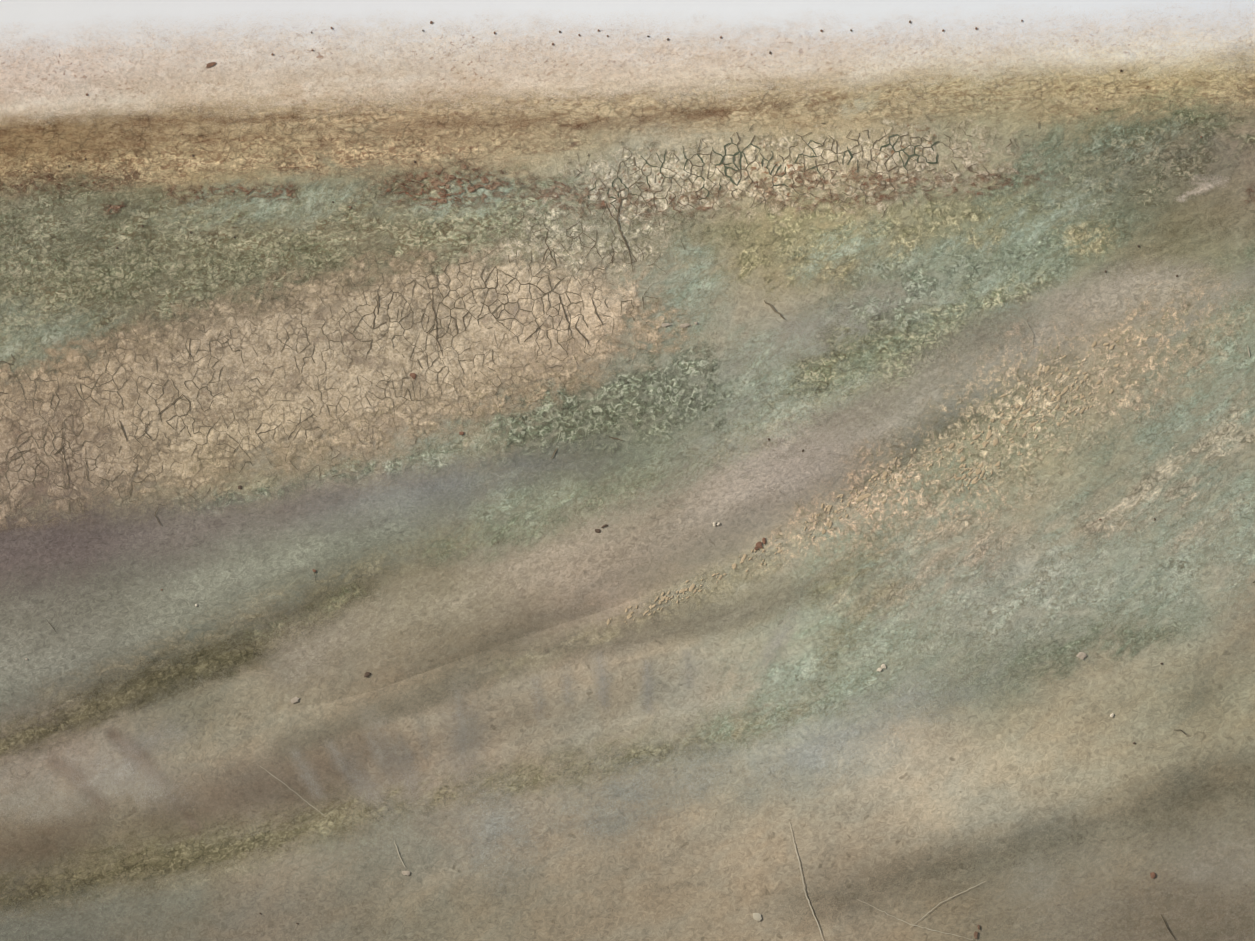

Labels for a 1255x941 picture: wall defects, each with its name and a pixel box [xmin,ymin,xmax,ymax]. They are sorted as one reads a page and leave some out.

crack [0,112,1046,531]